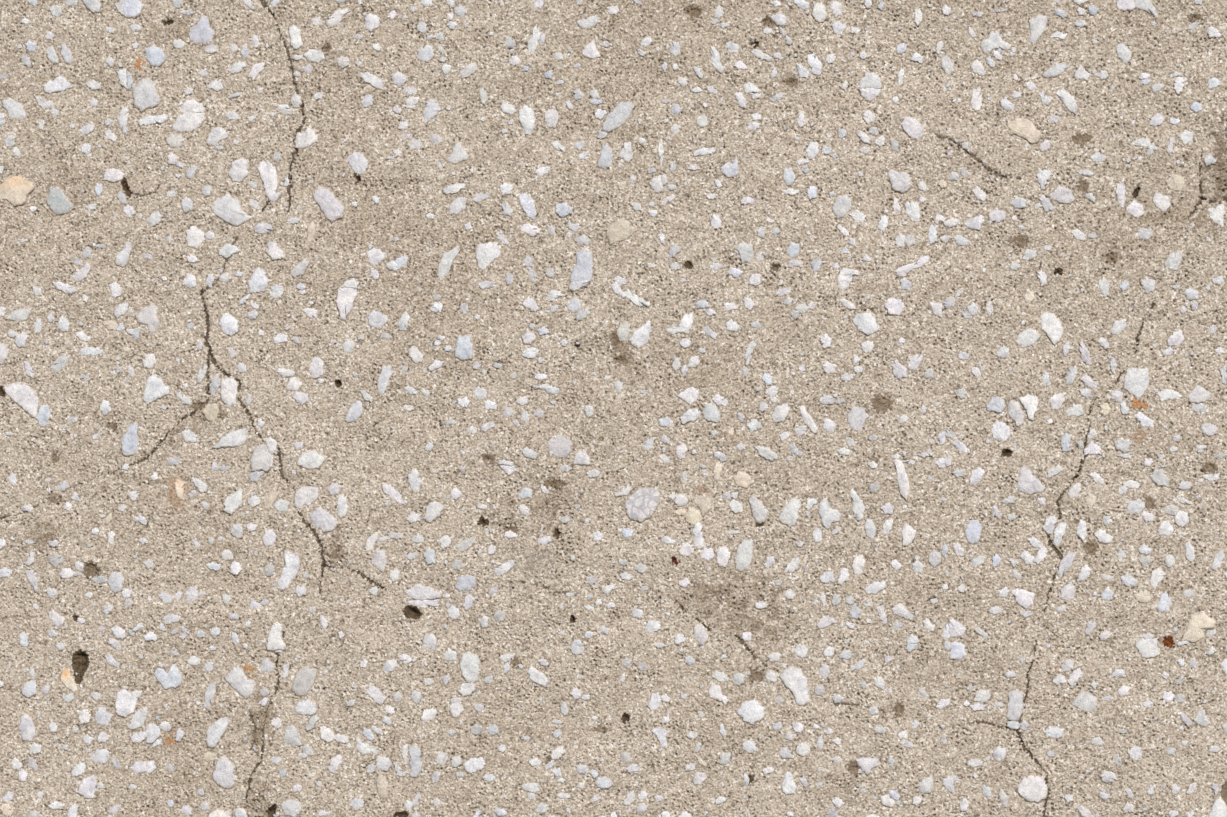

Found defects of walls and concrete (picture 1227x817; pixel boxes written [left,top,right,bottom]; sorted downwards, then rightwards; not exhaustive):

crack [261,0,306,214]
crack [0,236,384,593]
crack [1043,300,1156,617]
crack [972,647,1051,817]